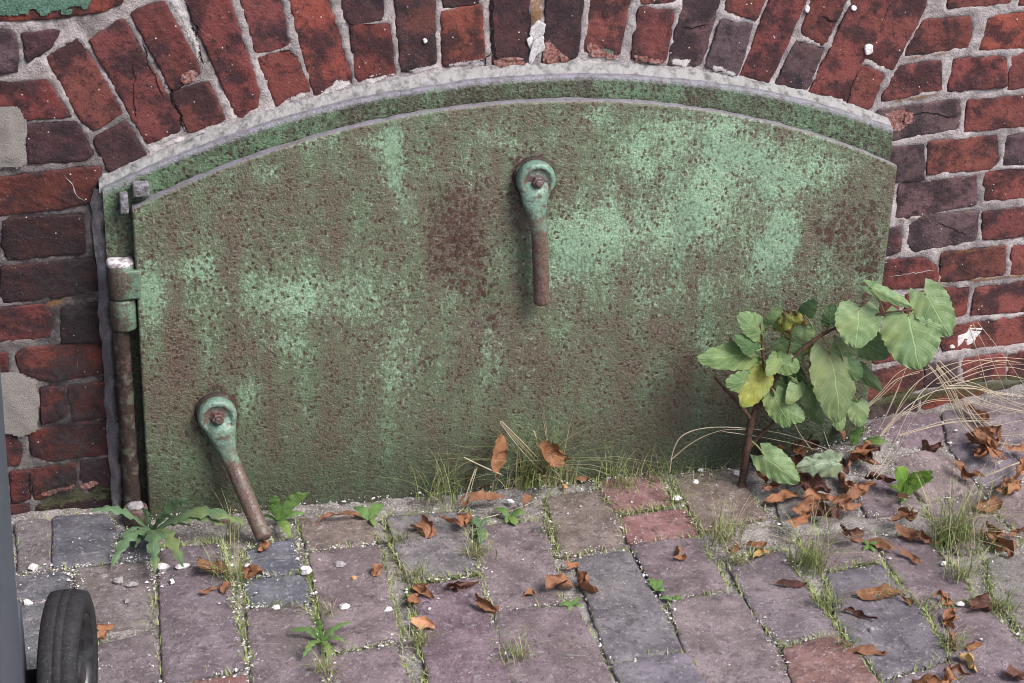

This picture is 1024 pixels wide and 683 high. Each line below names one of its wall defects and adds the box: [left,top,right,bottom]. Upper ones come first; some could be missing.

flaking render [494,20,569,68]
spalling [884,110,915,131]
corrosion [509,150,557,226]
corrosion [423,183,503,331]
corrosion [813,199,887,307]